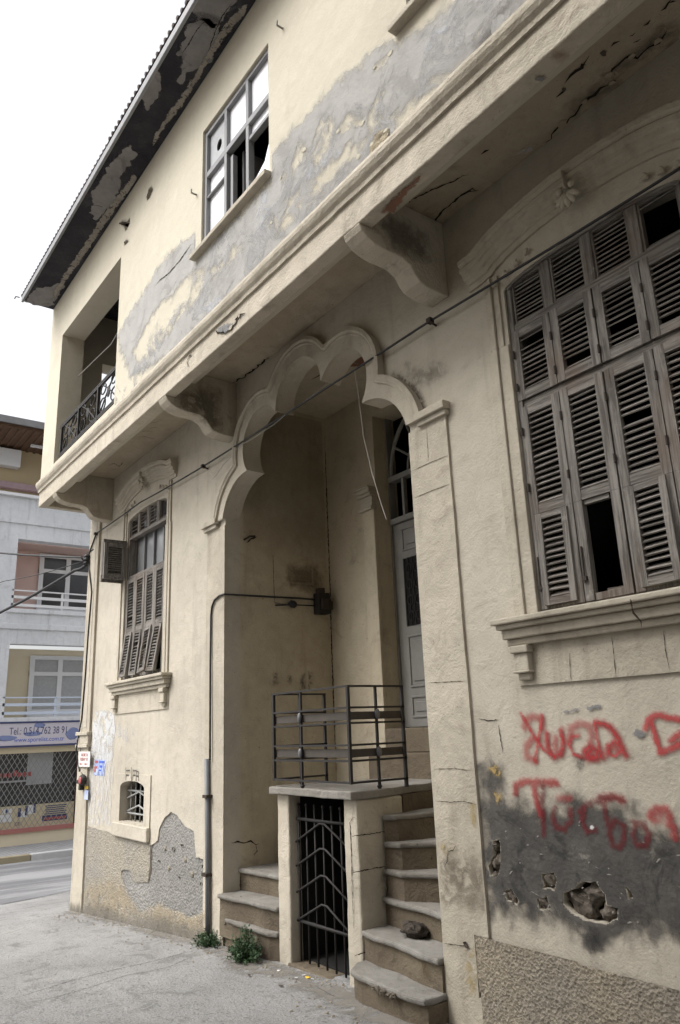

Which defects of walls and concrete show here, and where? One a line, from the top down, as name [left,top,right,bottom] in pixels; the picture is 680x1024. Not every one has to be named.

crack [542,0,675,147]
peeling [117,0,526,387]
crack [409,175,478,221]
flaking render [122,812,203,921]
flaking render [492,840,501,876]
water stain [442,763,680,951]
flaking render [539,872,618,925]